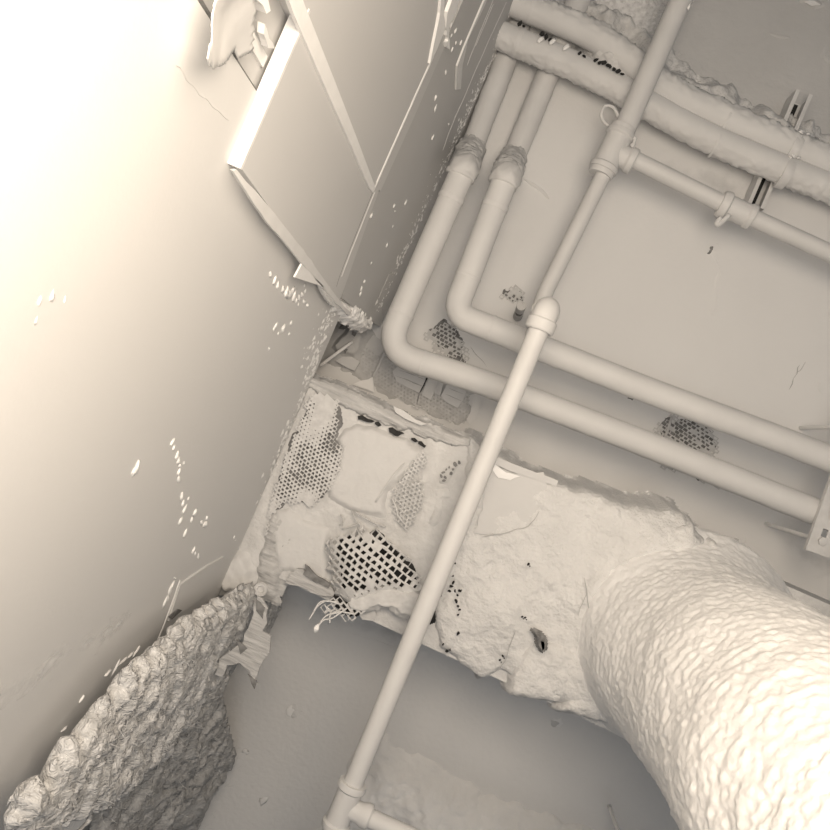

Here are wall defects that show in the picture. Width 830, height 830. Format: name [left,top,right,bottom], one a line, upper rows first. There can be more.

spalling [423,319,470,363]
peeling [393,406,426,426]
spalling [653,414,719,457]
spalling [257,392,345,606]
spalling [375,452,428,532]
spalling [439,460,461,484]